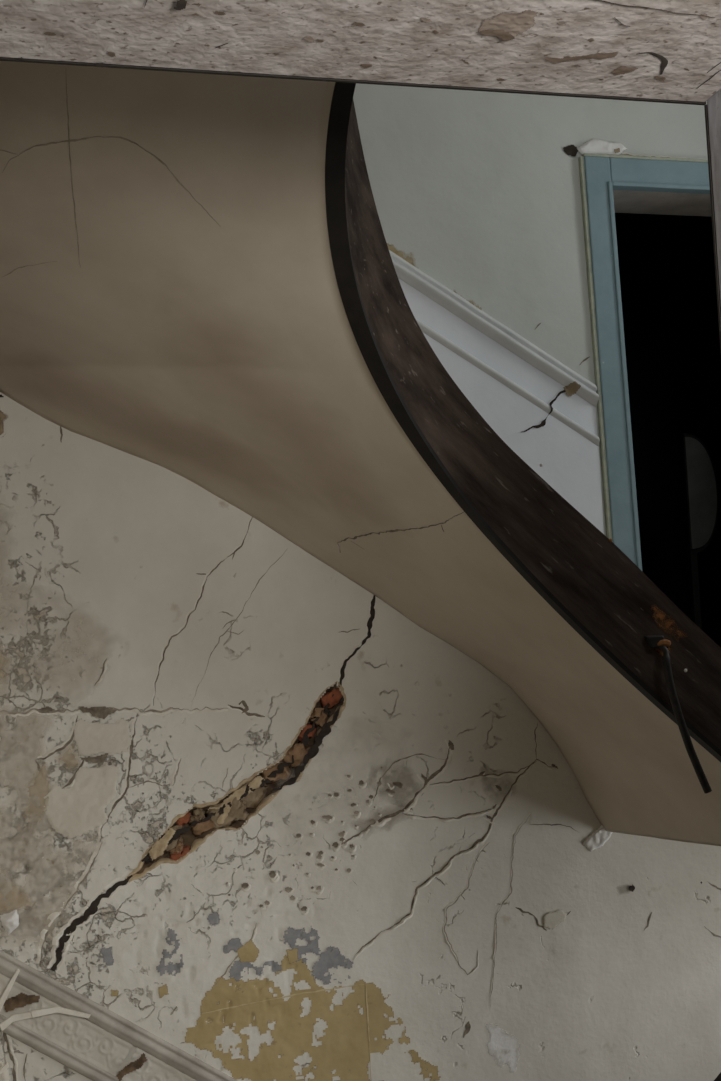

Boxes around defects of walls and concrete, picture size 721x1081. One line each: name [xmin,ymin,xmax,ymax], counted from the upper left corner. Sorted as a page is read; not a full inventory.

spalling [0,410,9,439]
crack [522,388,568,432]
peeling [42,706,132,839]
crack [0,516,375,973]
spalling [288,766,413,895]
peeling [208,912,220,925]
spalling [269,871,310,915]
crack [342,723,578,1038]
peeling [100,947,114,966]
peeling [155,928,183,998]
crack [214,923,259,986]
peeling [185,927,441,1081]